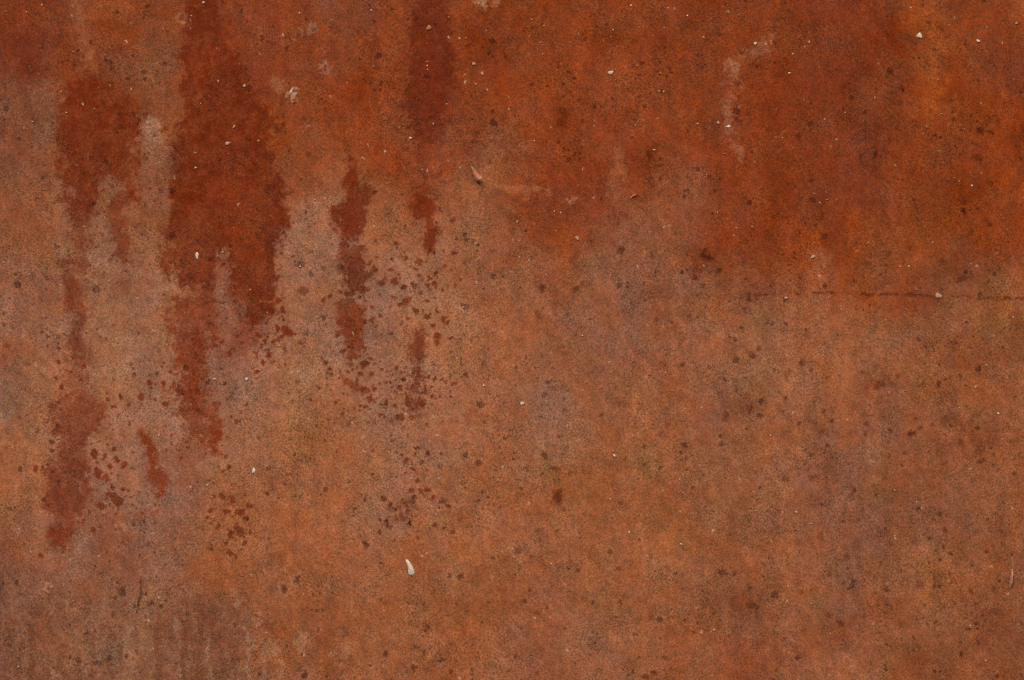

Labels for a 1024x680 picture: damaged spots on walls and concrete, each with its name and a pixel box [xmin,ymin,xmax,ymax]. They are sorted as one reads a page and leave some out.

rust [30,0,307,575]
rust [316,0,469,423]